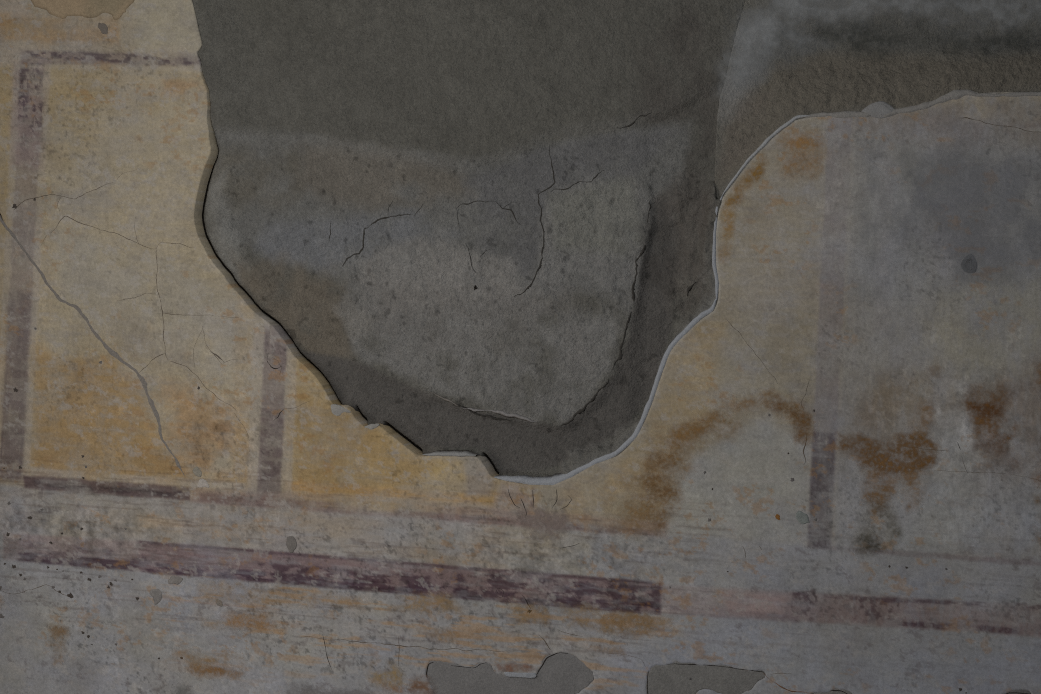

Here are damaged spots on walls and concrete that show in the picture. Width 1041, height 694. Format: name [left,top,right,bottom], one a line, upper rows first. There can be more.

crack [0,169,249,476]
crack [342,201,422,266]
crack [456,145,602,297]
flaking render [192,0,1041,535]